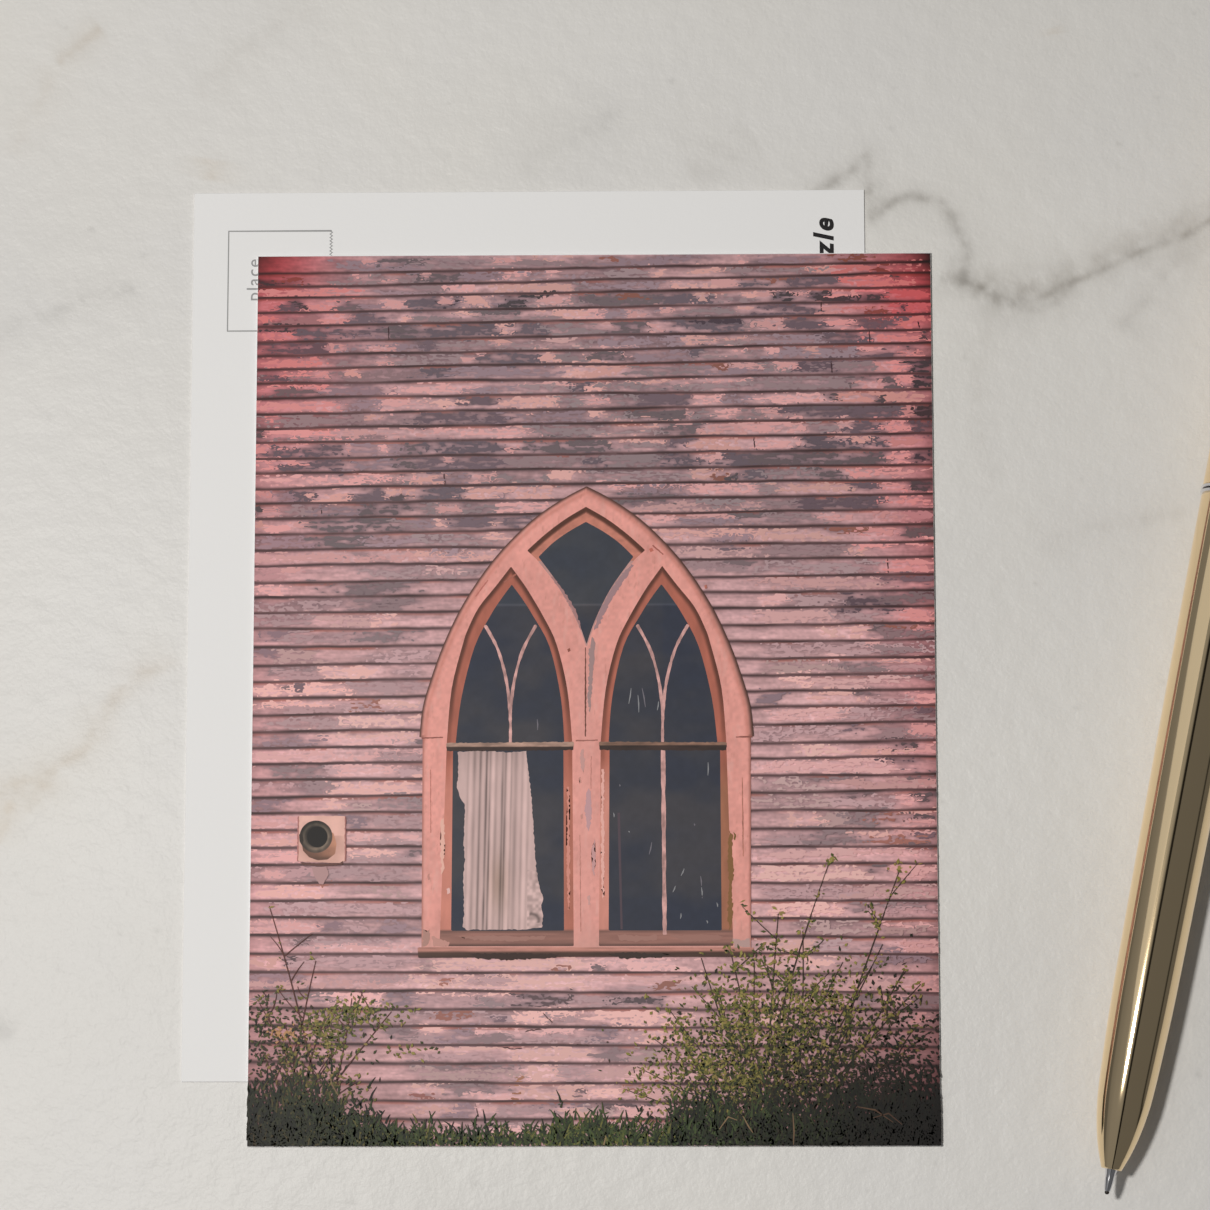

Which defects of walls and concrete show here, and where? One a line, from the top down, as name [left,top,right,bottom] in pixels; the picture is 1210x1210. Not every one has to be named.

peeling [251,255,937,909]